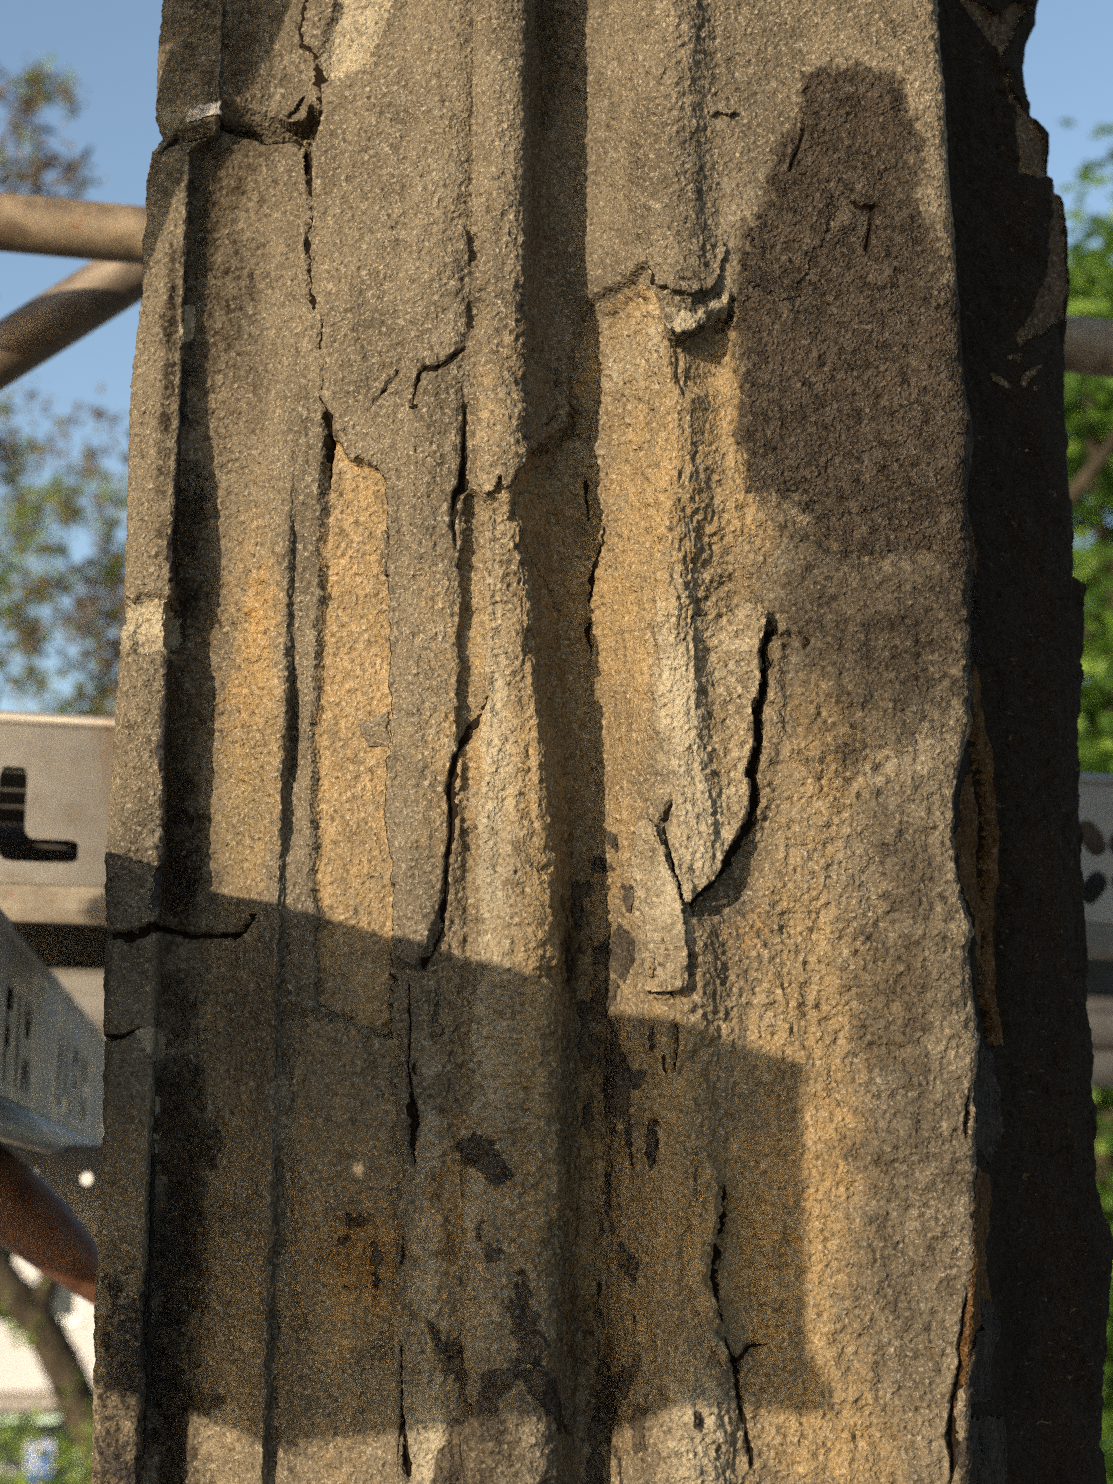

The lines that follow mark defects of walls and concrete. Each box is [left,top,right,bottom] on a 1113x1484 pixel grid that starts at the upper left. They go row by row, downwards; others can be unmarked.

crack [297,0,329,107]
crack [179,128,336,481]
crack [368,348,464,410]
crack [452,408,469,546]
spalling [476,221,767,993]
crack [660,629,809,906]
crack [111,914,257,942]
spalling [288,434,443,1423]
crack [406,696,489,1163]
peeling [686,1148,729,1369]
crack [709,1185,767,1466]